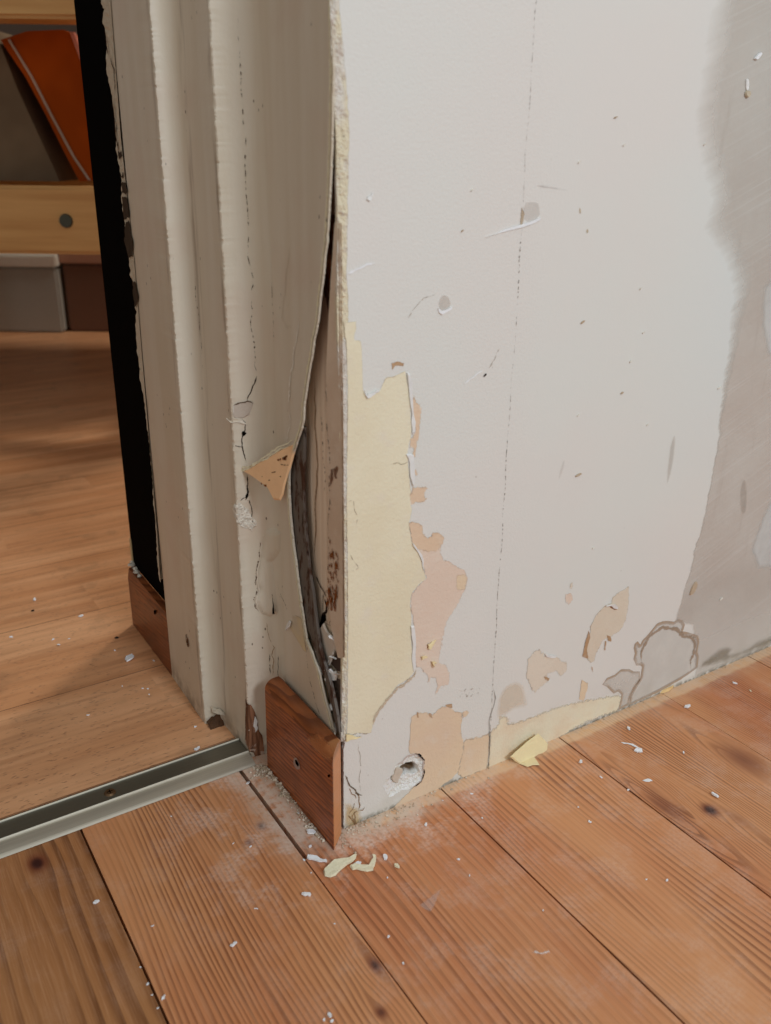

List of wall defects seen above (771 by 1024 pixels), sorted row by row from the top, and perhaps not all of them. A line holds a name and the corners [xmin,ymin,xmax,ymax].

peeling [316,0,468,742]
peeling [526,649,567,692]
peeling [583,587,629,671]
leakage [603,619,728,710]